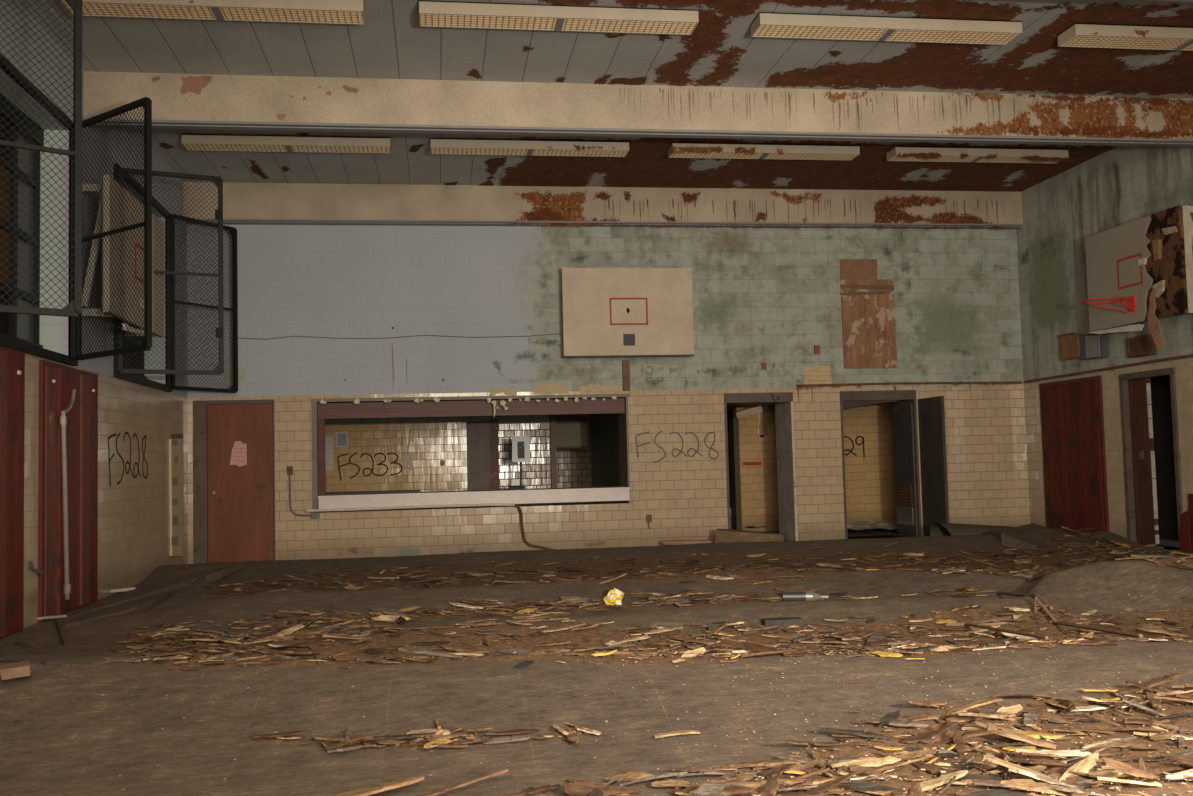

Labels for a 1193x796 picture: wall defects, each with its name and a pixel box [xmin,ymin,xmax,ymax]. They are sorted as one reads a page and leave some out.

peeling [541,0,1193,97]
corrosion [814,90,1193,143]
peeling [479,136,1117,192]
corrosion [898,152,942,160]
corrosion [1022,155,1069,163]
corrosion [508,189,1021,230]